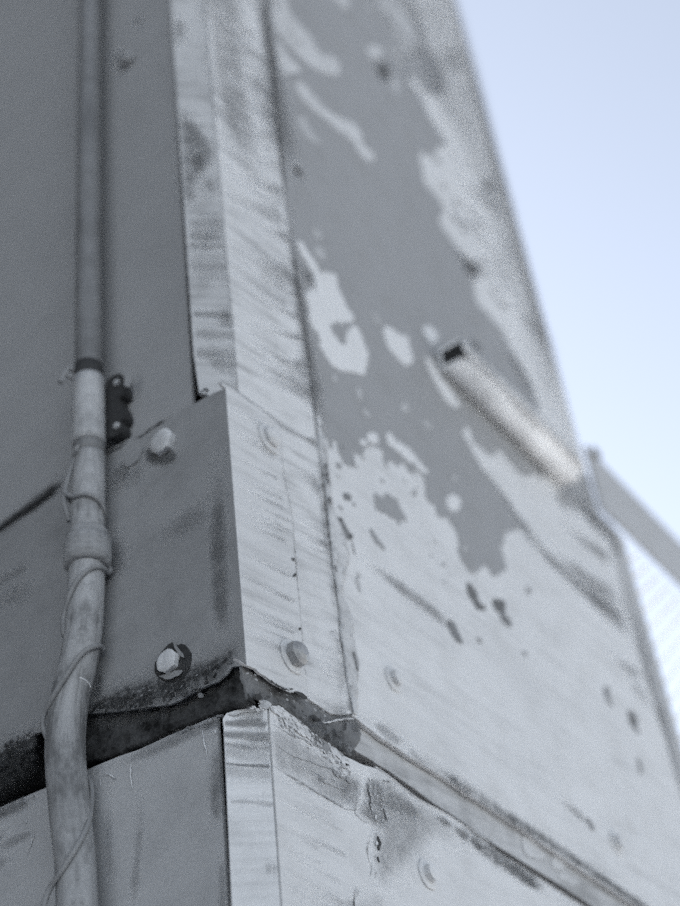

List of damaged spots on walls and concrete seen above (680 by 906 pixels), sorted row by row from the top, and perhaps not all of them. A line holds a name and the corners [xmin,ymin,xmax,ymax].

peeling [264,0,546,627]
peeling [447,619,463,645]
spalling [228,700,354,783]
crack [270,722,390,876]